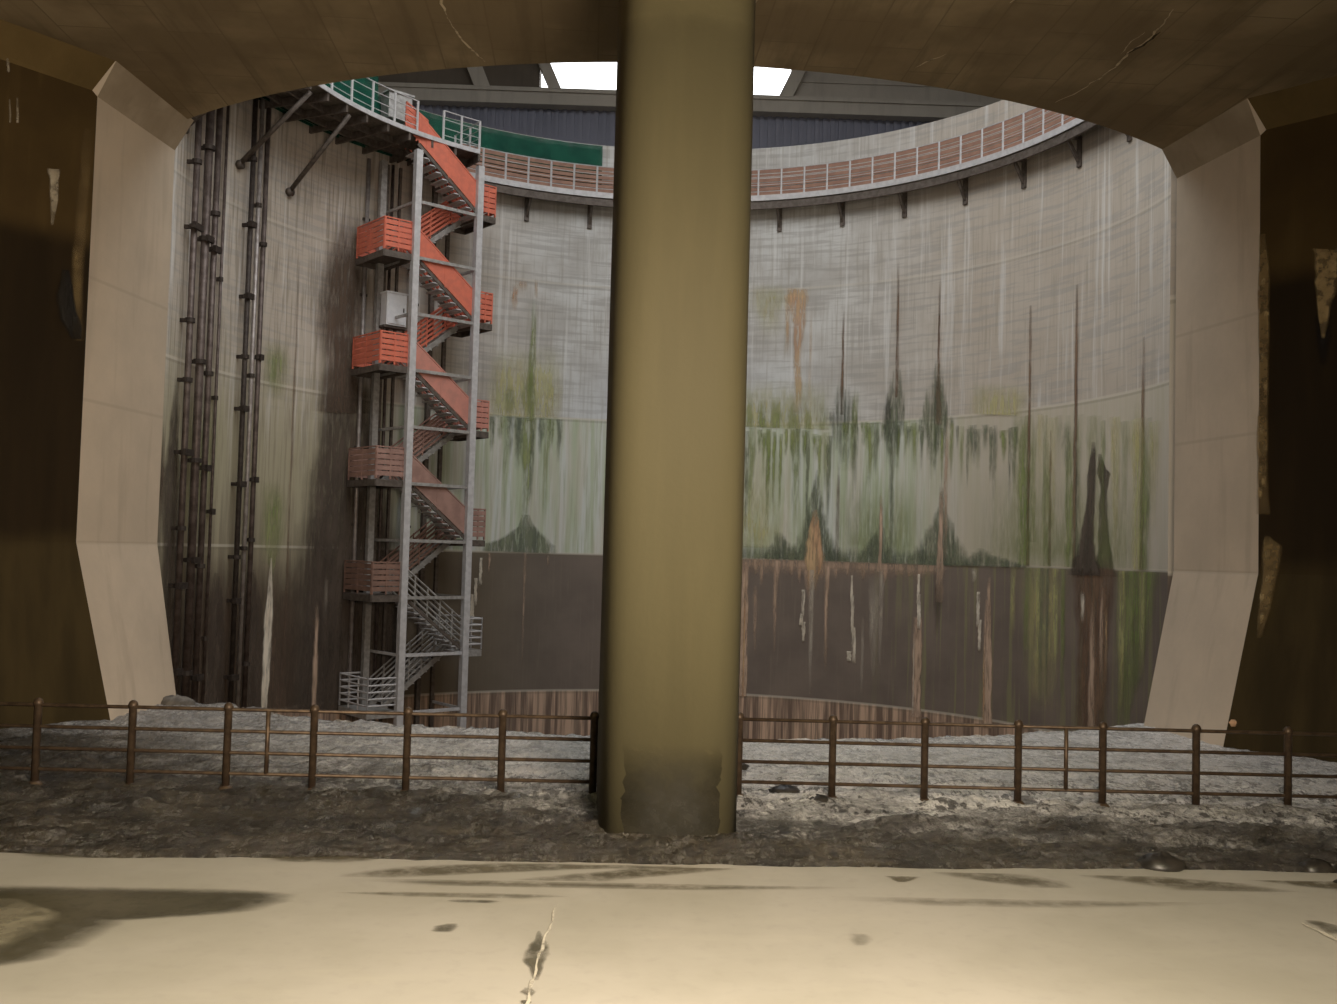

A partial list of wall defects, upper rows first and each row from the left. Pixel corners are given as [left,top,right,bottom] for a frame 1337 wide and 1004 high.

crack [1056,9,1174,102]
peeling [48,169,60,221]
damp [159,234,397,710]
damp [490,328,561,493]
corrosion [786,290,806,394]
damp [739,288,1025,728]
damp [1025,447,1143,727]
peeling [1315,249,1337,358]